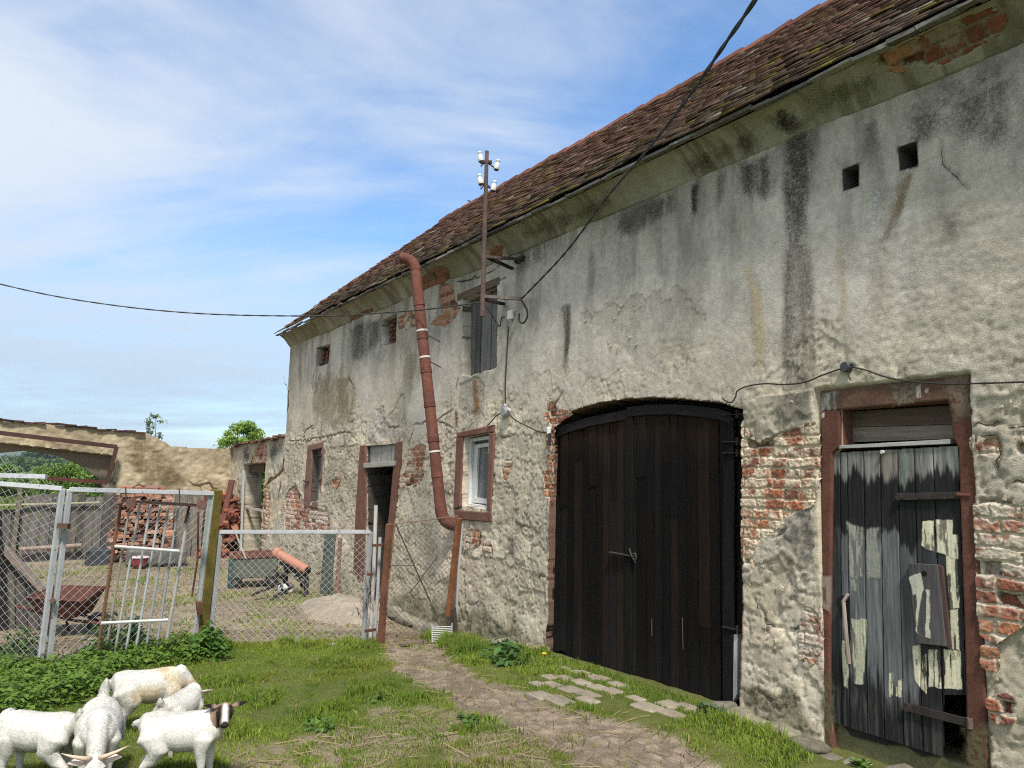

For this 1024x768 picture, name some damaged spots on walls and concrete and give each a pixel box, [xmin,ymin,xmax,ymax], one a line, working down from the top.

spalling [873,6,1008,73]
damp [777,110,811,223]
spalling [422,266,460,327]
spalling [285,447,330,530]
spalling [399,442,426,489]
spalling [495,397,573,546]
spalling [740,392,836,634]
spalling [967,495,1024,768]